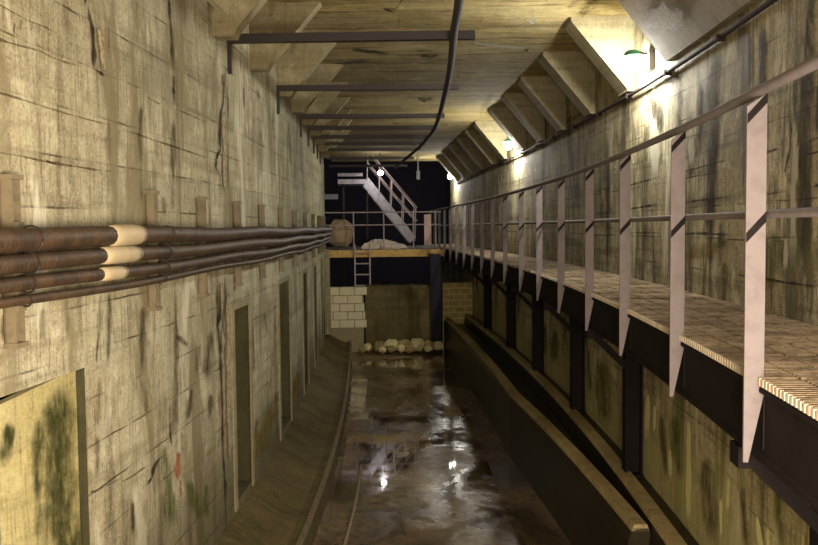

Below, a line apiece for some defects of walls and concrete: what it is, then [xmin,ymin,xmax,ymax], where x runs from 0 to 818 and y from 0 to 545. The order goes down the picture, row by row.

crack [0,38,67,63]
crack [56,1,109,76]
leakage [748,32,767,88]
leakage [804,0,815,61]
crack [133,0,229,189]
leakage [784,72,818,265]
leakage [1,426,15,458]
leakage [34,425,42,493]
leakage [645,394,672,478]
leakage [702,463,730,536]
leakage [740,493,770,545]